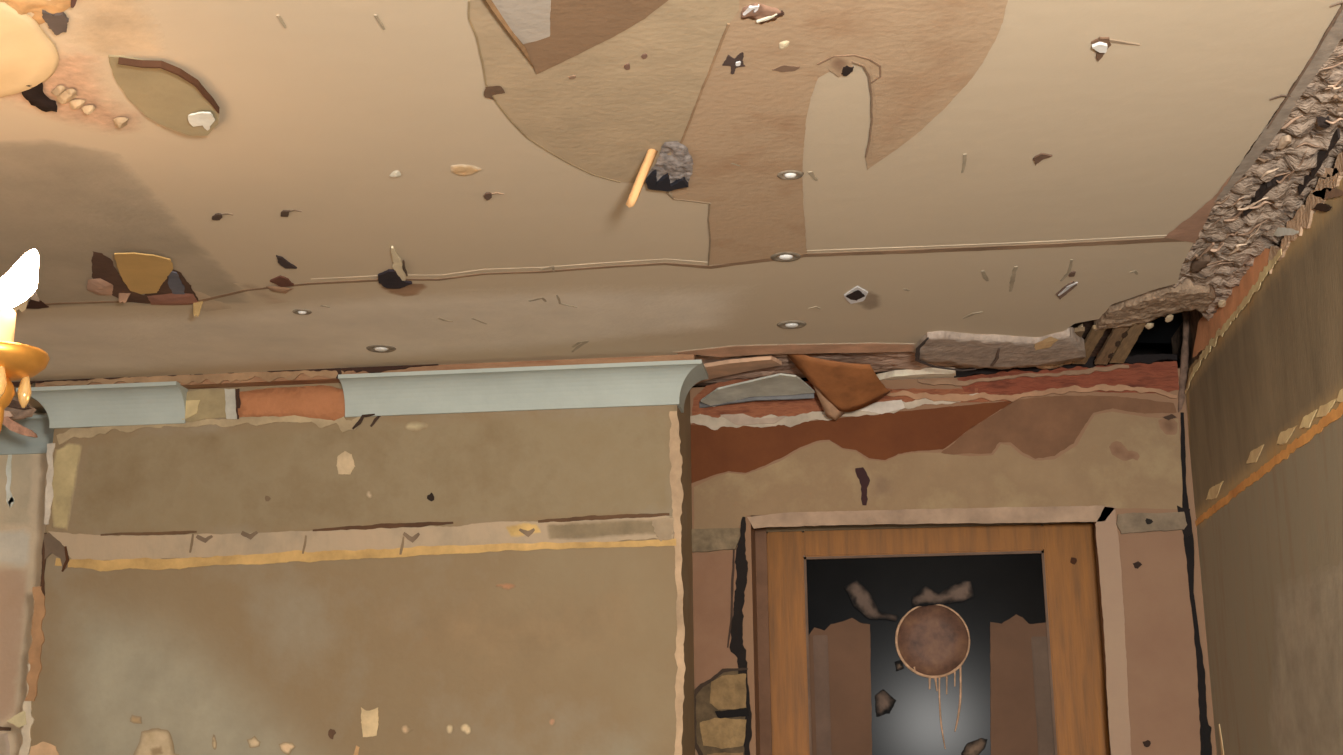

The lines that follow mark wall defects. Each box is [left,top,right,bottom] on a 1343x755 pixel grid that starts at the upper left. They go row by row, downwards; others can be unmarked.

spalling [21,83,96,115]
peeling [108,55,220,136]
peeling [468,0,1008,266]
spalling [87,251,203,317]
peeling [0,566,29,745]
peeling [29,742,59,755]
spalling [130,715,179,755]
peeling [0,370,674,572]
spalling [361,708,379,737]
crack [727,517,752,755]
peeling [672,10,1343,755]
crack [886,348,1224,755]